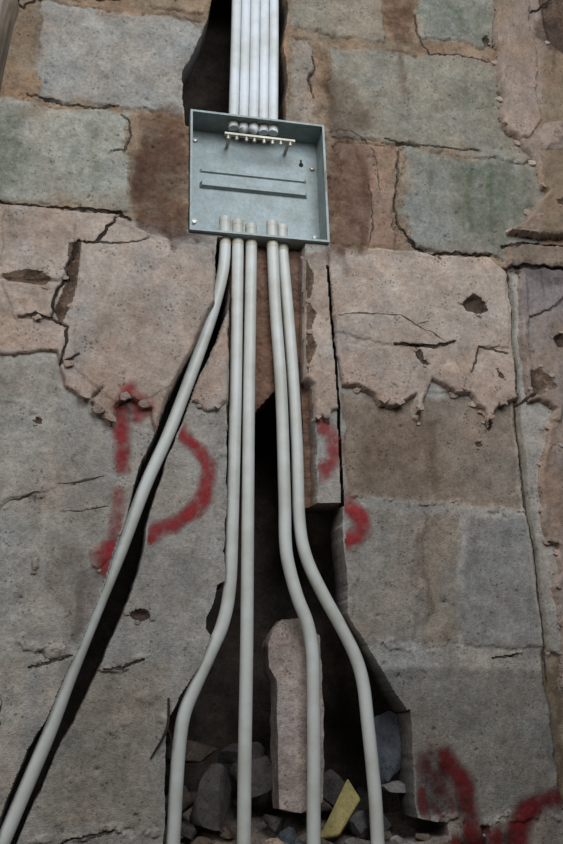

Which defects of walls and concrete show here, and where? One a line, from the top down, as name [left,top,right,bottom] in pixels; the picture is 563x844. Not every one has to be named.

crack [1,476,101,508]
crack [0,200,146,365]
flaking render [0,204,216,434]
flaking render [187,318,229,412]
flaking render [300,0,563,690]
crack [326,128,563,681]